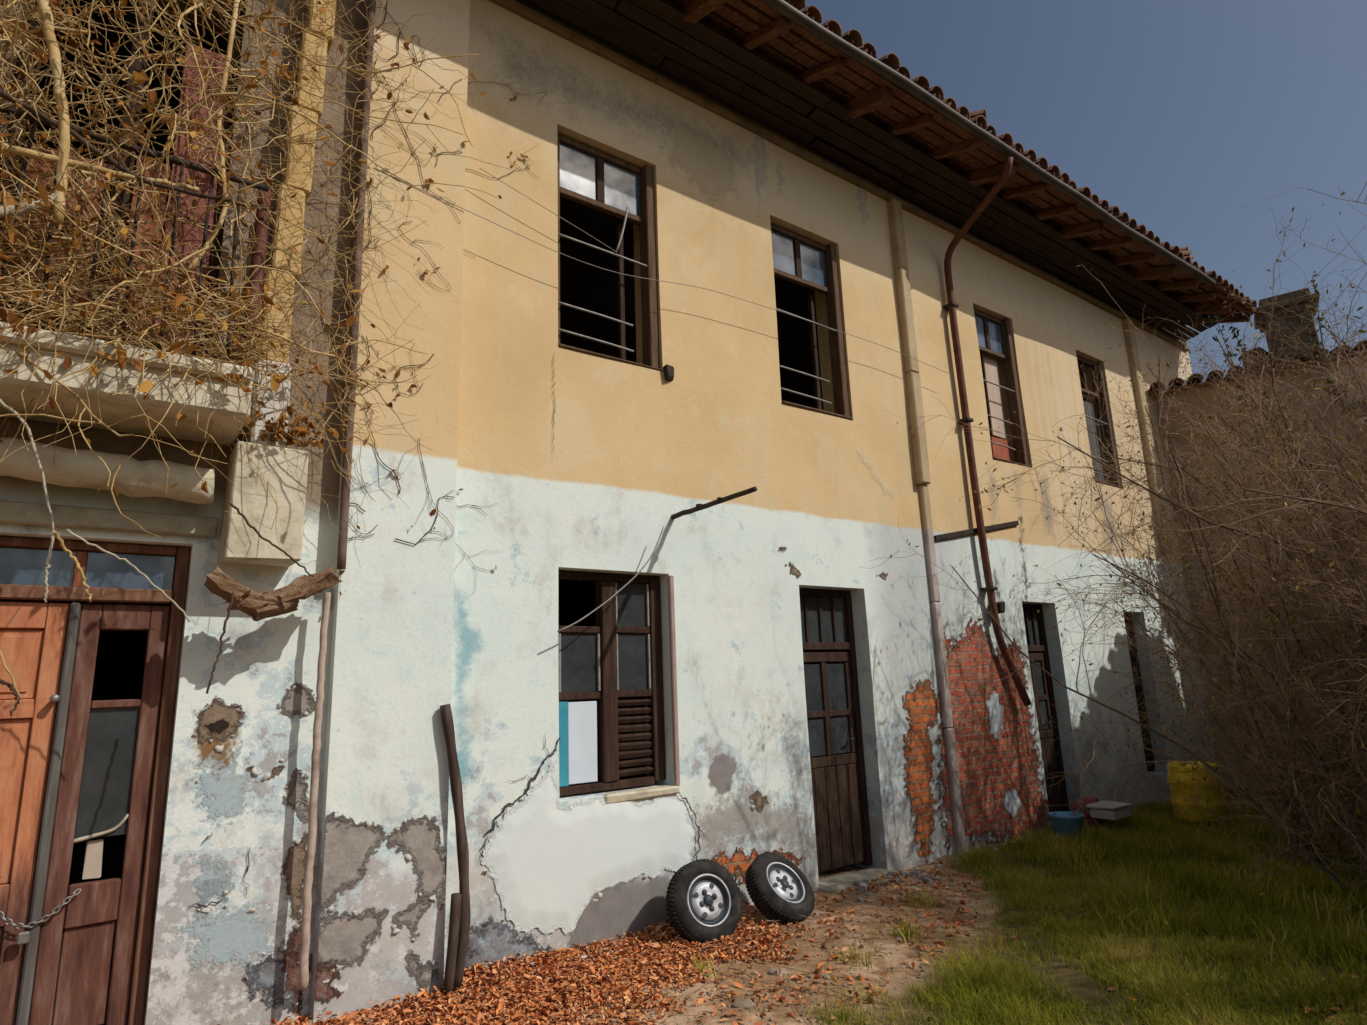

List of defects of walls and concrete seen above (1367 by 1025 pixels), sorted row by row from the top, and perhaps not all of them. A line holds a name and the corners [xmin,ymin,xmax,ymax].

spalling [277,683,317,721]
spalling [166,695,447,1014]
crack [480,733,561,858]
flaking render [903,616,1051,862]